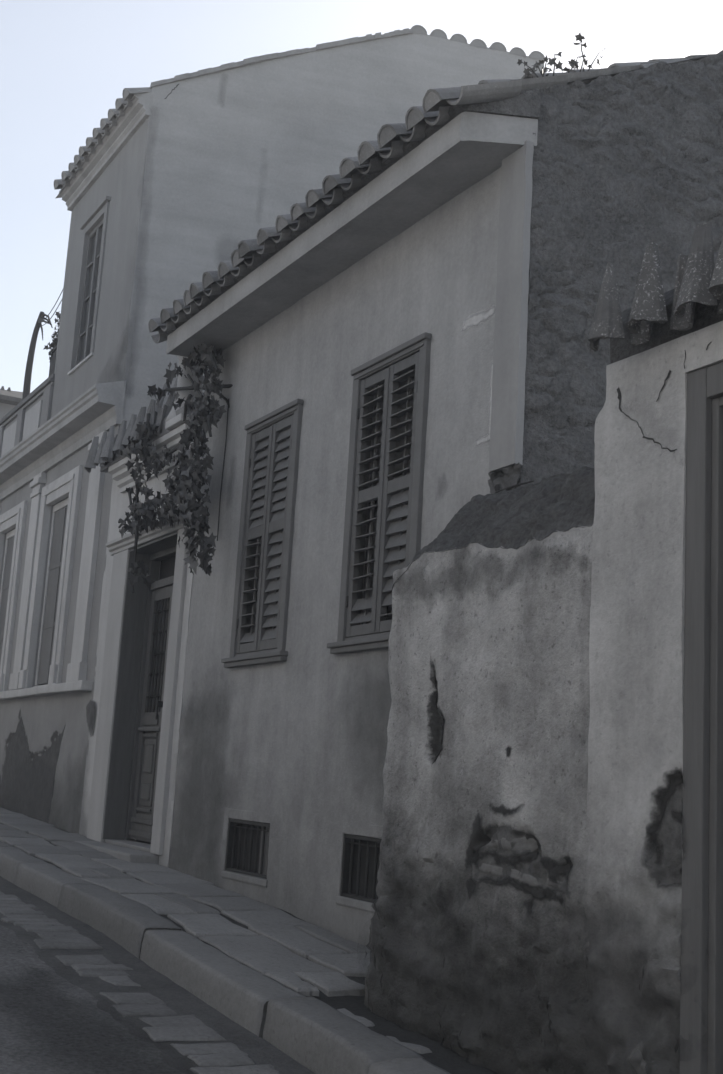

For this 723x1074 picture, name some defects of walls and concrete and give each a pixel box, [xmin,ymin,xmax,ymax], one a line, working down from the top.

crack [617,388,677,452]
crack [656,342,711,402]
flaking render [0,710,66,823]
flaking render [427,662,445,764]
flaking render [465,803,573,915]
flaking render [642,769,685,887]